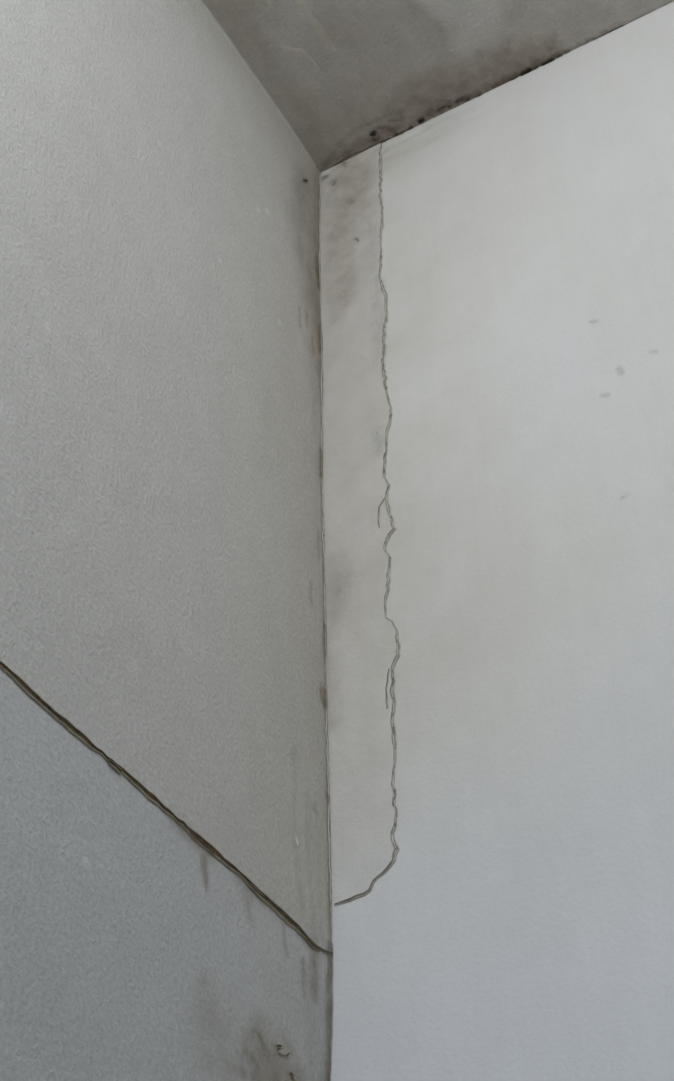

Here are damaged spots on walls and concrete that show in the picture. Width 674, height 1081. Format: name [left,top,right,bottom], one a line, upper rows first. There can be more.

damp [500,51,569,83]
crack [319,0,674,930]
crack [0,661,333,977]
crack [325,1008,333,1040]